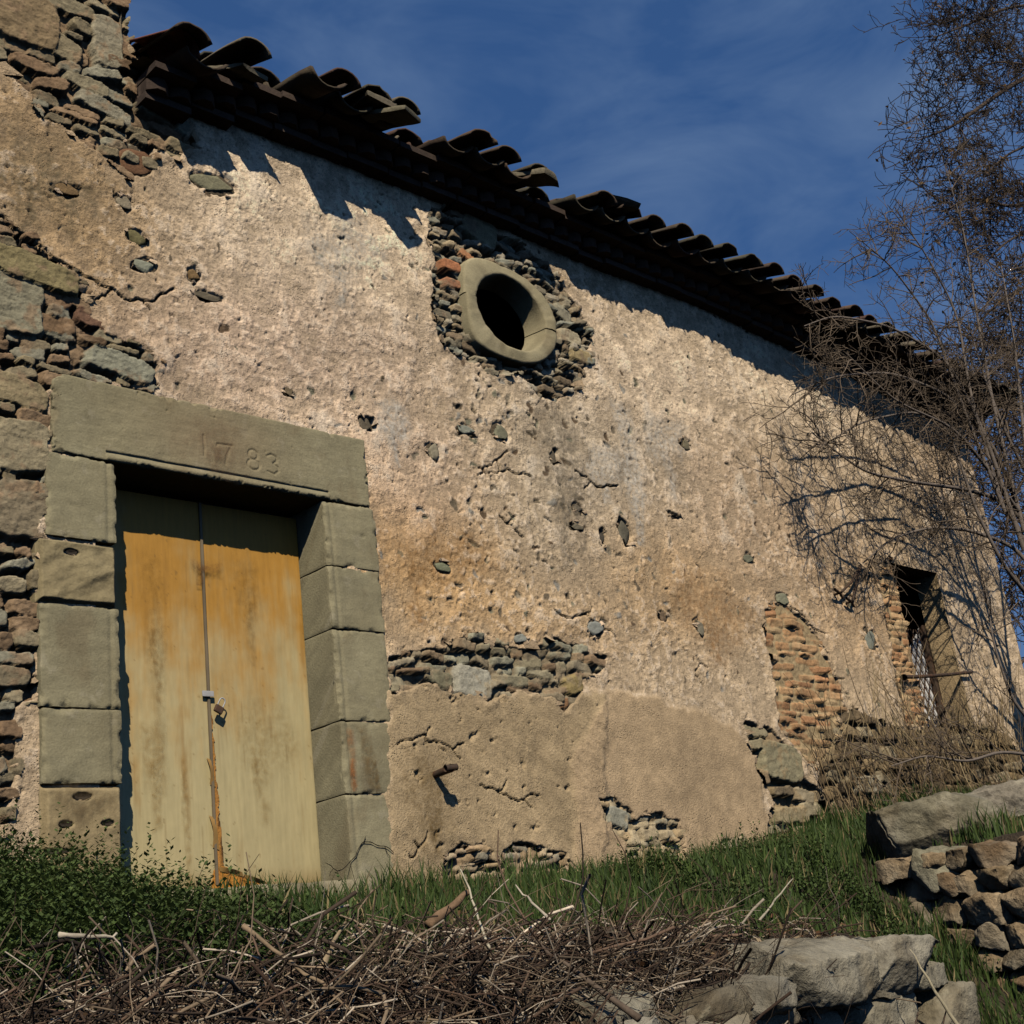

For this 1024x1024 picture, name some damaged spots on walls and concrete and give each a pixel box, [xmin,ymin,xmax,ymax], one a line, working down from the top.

spalling [0,0,235,212]
crack [0,216,58,263]
crack [89,279,172,304]
spalling [425,203,596,402]
spalling [0,218,167,838]
spalling [388,621,606,712]
flaking render [717,557,1024,852]
peeling [443,839,575,886]
spalling [599,791,687,861]